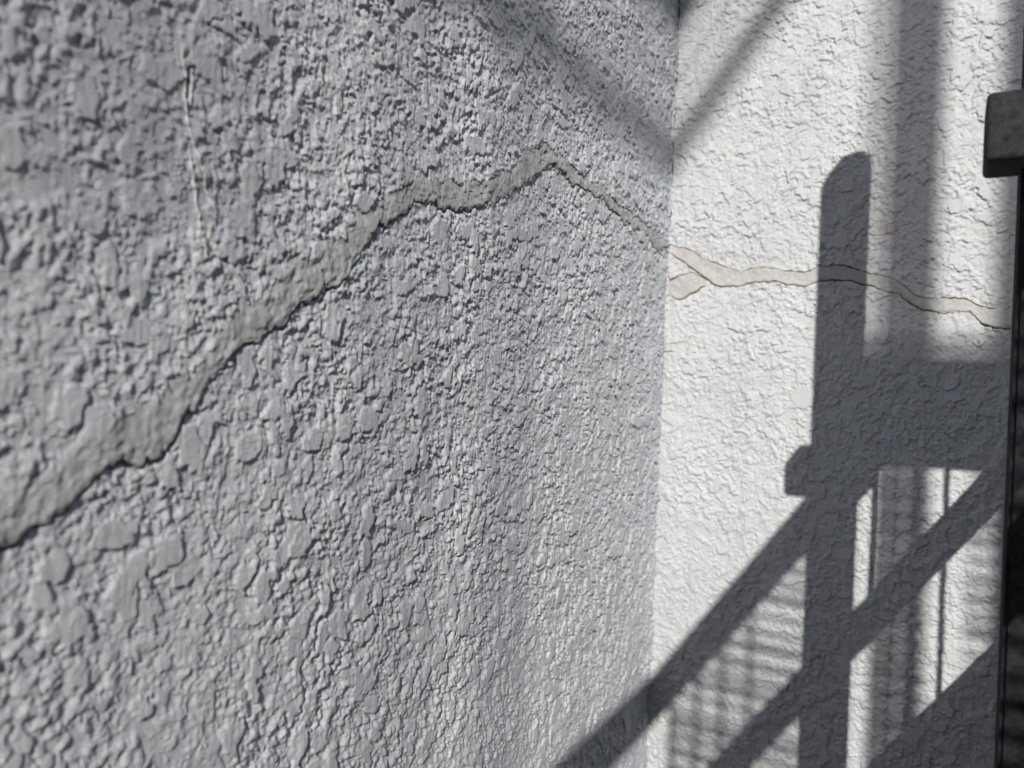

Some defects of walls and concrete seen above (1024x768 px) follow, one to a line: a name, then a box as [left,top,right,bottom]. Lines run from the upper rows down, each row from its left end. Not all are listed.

crack [0,42,1012,548]